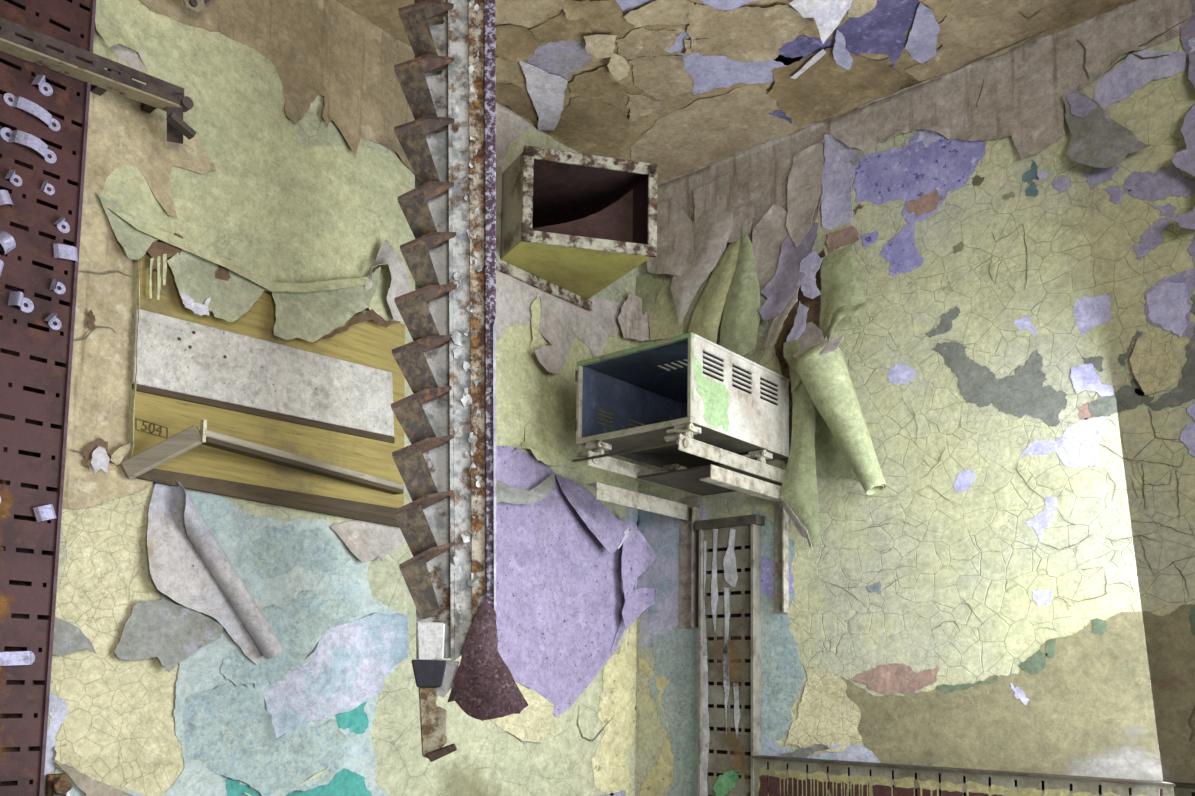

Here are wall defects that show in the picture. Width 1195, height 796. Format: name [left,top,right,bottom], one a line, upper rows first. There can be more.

crack [989,224,1028,286]
rust [0,487,13,537]
peeling [44,0,415,796]
peeling [490,0,1195,796]
crack [912,410,957,507]
crack [1016,411,1195,607]